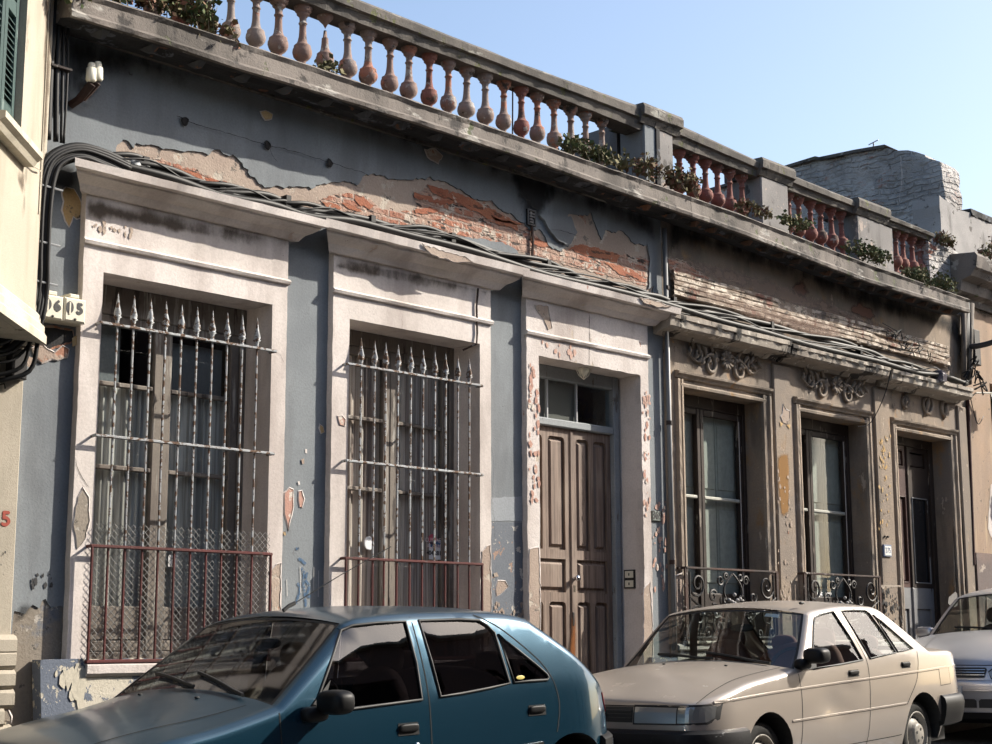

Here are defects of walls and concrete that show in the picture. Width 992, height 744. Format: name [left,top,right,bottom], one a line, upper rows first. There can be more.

flaking render [61,187,82,227]
peeling [93,220,133,239]
flaking render [116,140,865,323]
flaking render [27,325,77,367]
peeling [528,363,541,504]
flaking render [72,487,91,549]
peeling [283,481,305,535]
flaking render [480,544,541,629]
peeling [4,573,87,726]